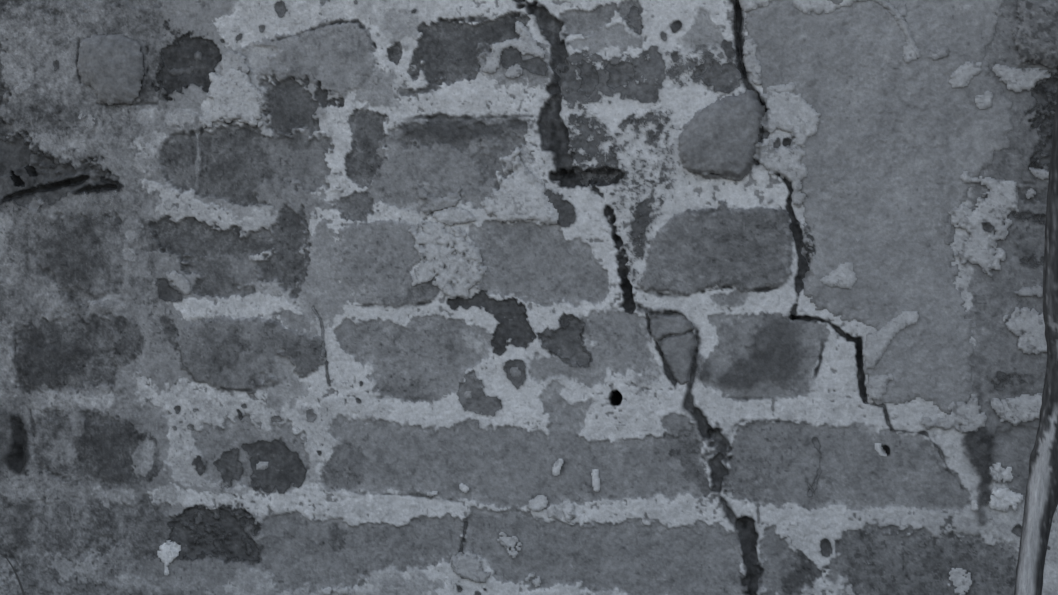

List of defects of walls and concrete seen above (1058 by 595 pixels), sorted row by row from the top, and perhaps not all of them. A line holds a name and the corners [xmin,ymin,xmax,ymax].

peeling [152,19,269,128]
peeling [483,20,821,282]
peeling [944,61,1058,277]
peeling [408,147,591,389]
crack [513,0,764,595]
crack [729,0,963,497]
peeling [1003,285,1047,355]
peeling [457,370,502,416]
peeling [921,371,1042,433]
spalling [157,505,264,576]
peeling [192,438,306,494]
peeling [972,463,1023,512]